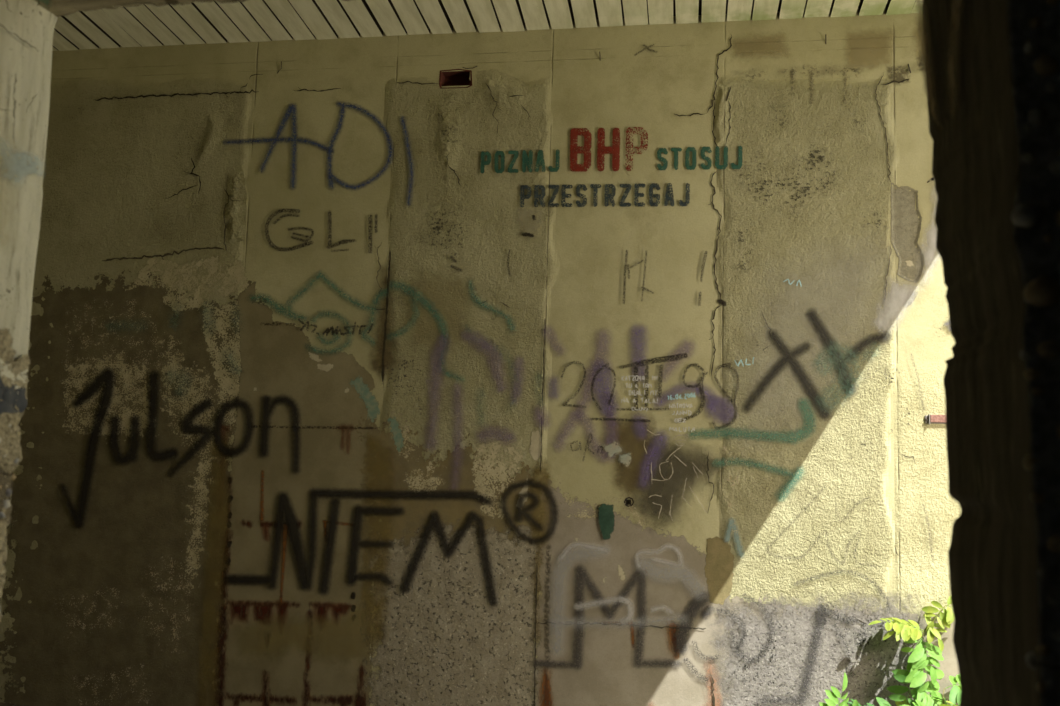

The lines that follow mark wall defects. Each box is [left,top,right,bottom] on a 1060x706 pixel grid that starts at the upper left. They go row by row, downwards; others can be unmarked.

crack [96,74,263,101]
crack [675,35,732,146]
crack [875,72,909,182]
crack [102,158,244,261]
crack [709,171,722,376]
crack [884,243,892,306]
spalling [891,183,924,307]
peeling [0,256,959,706]
rust [214,470,366,706]
rust [540,545,552,706]
rust [668,621,679,658]
rust [707,664,721,706]